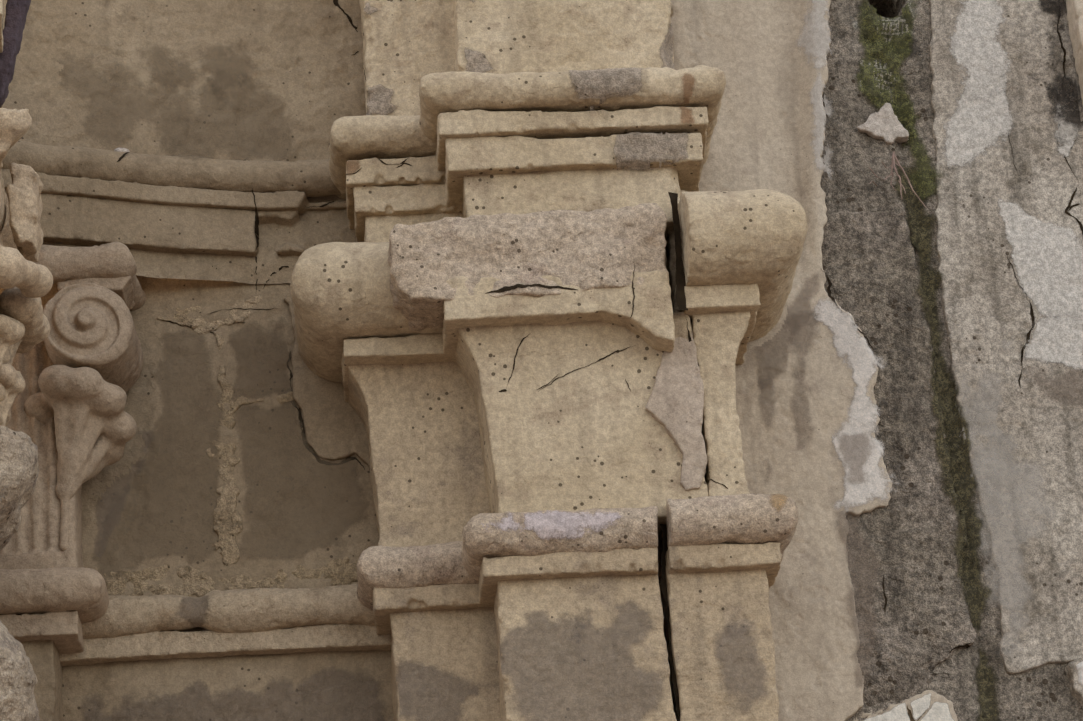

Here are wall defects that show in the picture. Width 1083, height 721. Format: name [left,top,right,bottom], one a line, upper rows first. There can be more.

crack [333,0,366,80]
crack [1057,16,1066,83]
crack [1057,123,1083,235]
crack [157,188,370,470]
crack [498,336,527,392]
crack [485,284,578,294]
crack [537,345,635,392]
peeling [814,300,892,511]
crack [1007,256,1056,387]
crack [660,524,680,717]
peeling [863,690,958,721]